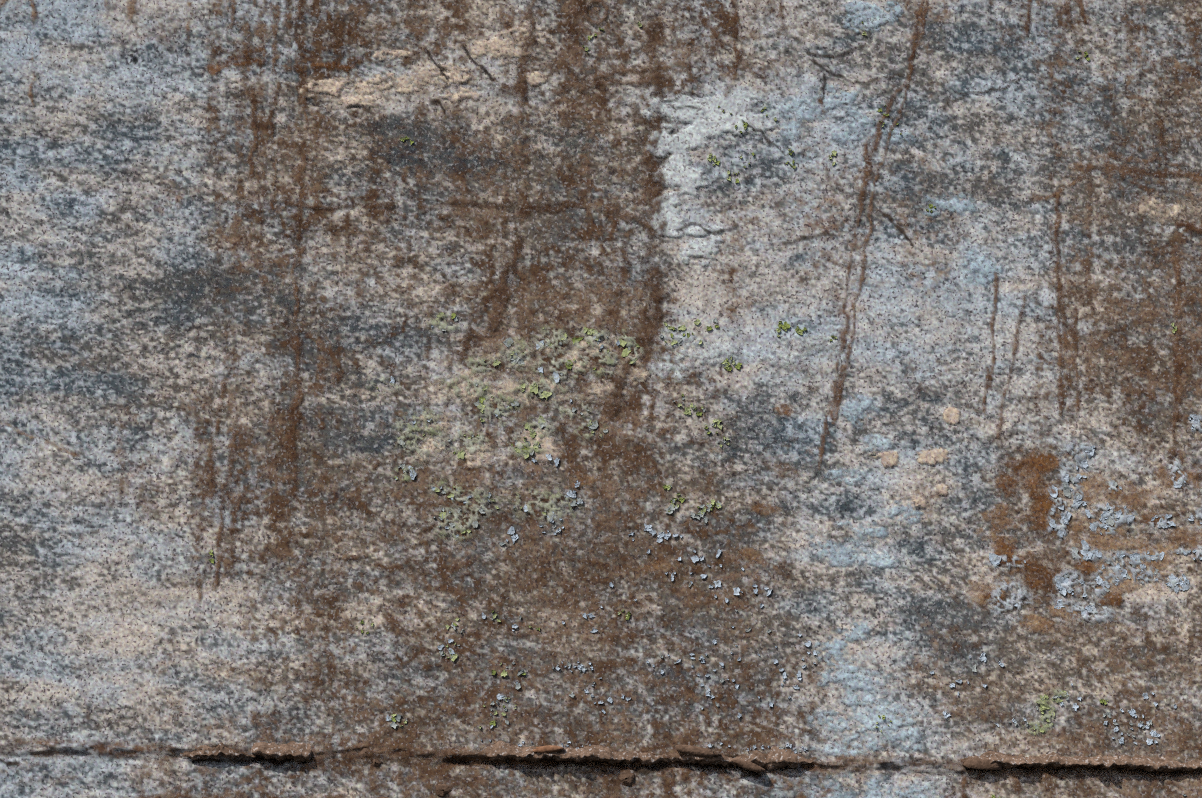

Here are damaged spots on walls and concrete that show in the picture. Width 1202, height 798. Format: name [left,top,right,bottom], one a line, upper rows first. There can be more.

damp [139,0,827,798]
damp [940,0,1202,798]
rust [981,452,1062,589]
rust [1073,474,1202,605]
crack [193,757,312,766]
crack [447,758,760,778]
crack [1015,766,1200,776]